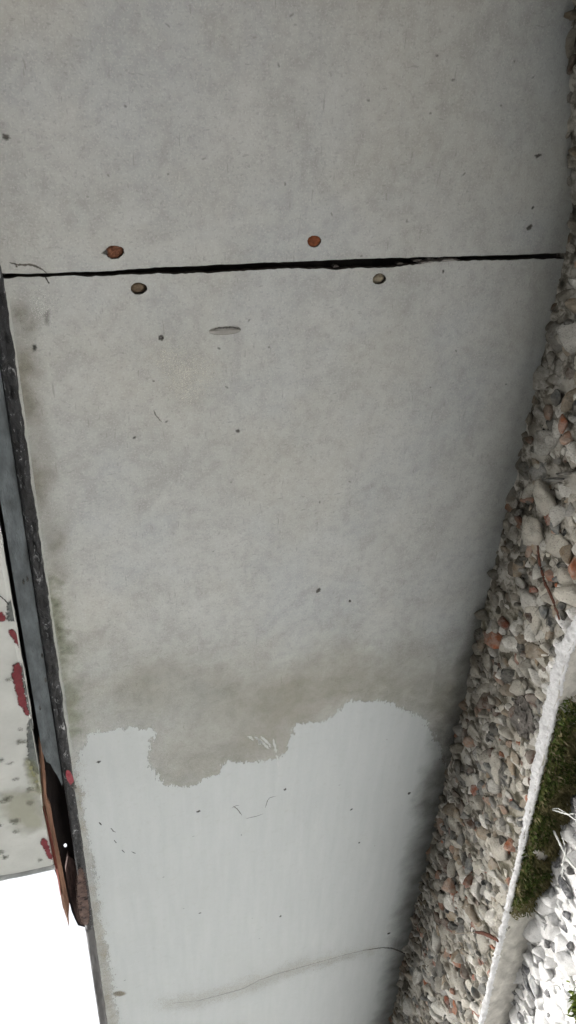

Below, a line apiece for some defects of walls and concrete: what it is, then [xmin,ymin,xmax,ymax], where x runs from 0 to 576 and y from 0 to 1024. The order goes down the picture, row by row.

crack [10,262,49,283]
damp [391,736,455,1005]